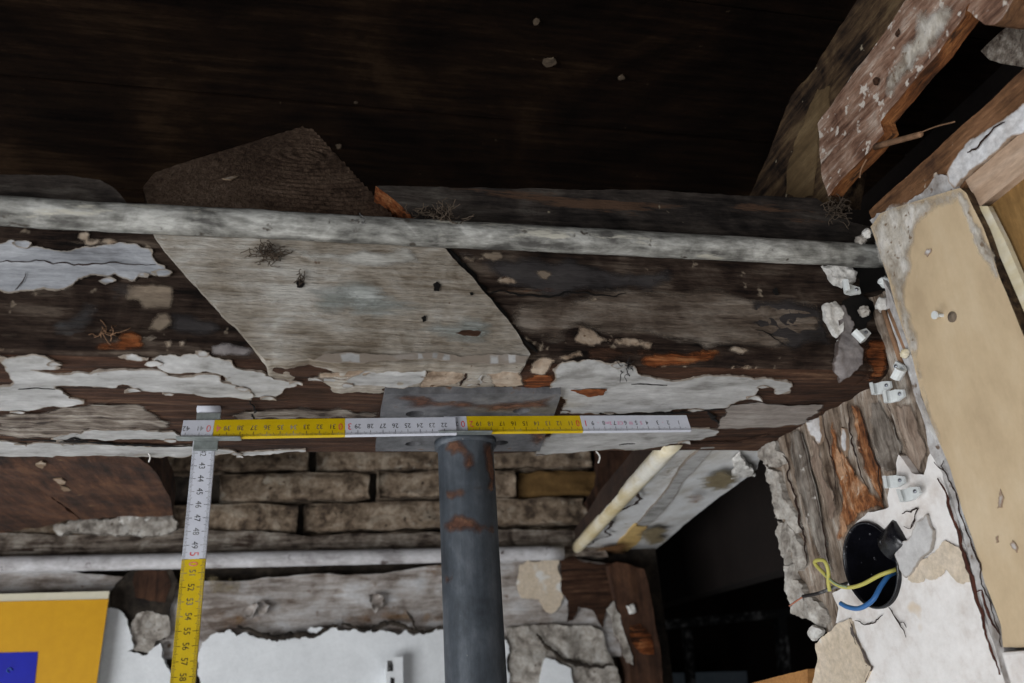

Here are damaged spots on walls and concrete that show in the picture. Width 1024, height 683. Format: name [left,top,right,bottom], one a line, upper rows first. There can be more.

crack [967,122,1005,153]
peeling [0,240,173,294]
peeling [0,350,529,414]
corrosion [401,397,547,411]
peeling [0,428,193,458]
peeling [215,447,306,458]
peeling [534,359,836,520]
peeling [841,427,850,457]
flaking render [895,514,972,584]
flaking render [505,556,633,683]